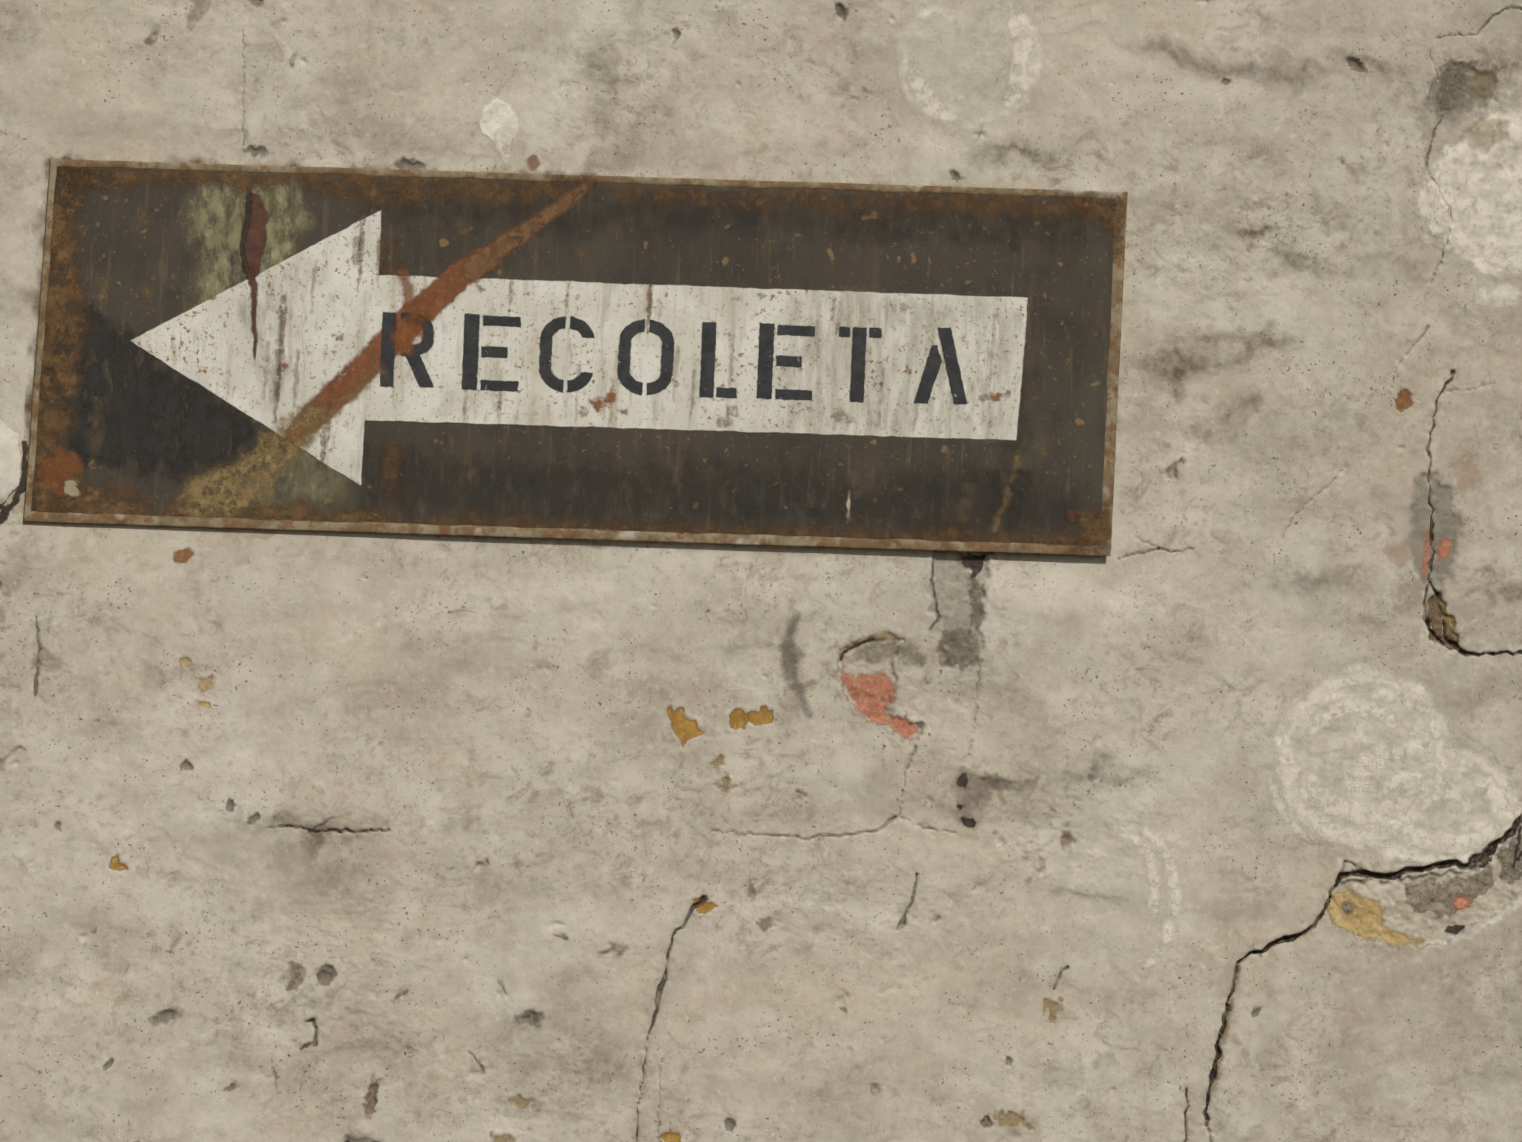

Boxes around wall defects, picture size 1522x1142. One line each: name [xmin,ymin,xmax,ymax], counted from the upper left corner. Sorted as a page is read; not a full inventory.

flaking render [1428,62,1495,120]
leakage [1417,106,1522,308]
crack [0,441,29,524]
crack [1423,377,1520,657]
flaking render [930,552,986,668]
peeling [747,706,774,725]
flaking render [836,631,923,741]
leakage [1268,663,1522,870]
flaking render [1327,827,1522,949]
crack [636,896,706,1136]
crack [1184,814,1522,1142]